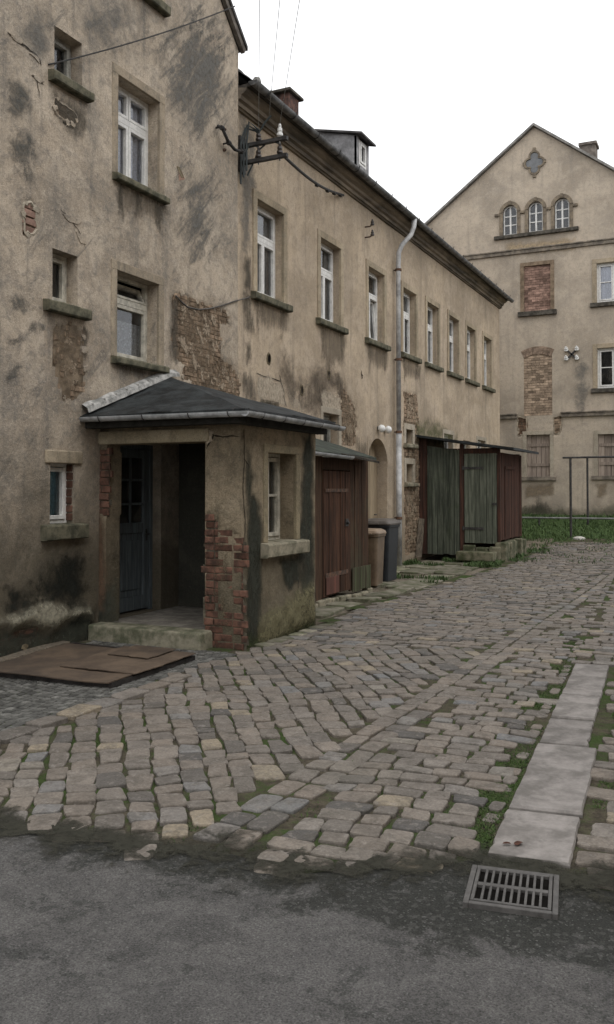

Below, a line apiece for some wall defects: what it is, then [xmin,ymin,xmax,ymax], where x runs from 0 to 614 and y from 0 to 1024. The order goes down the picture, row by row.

crack [8,33,44,95]
flaking render [52,96,78,127]
leakage [161,5,232,135]
flaking render [20,201,41,238]
crack [61,210,86,245]
leakage [179,176,217,261]
flaking render [52,321,89,401]
peeling [171,289,241,396]
flaking render [403,391,420,555]
leakage [0,556,117,657]
flaking render [201,514,249,651]
leakage [246,457,262,644]